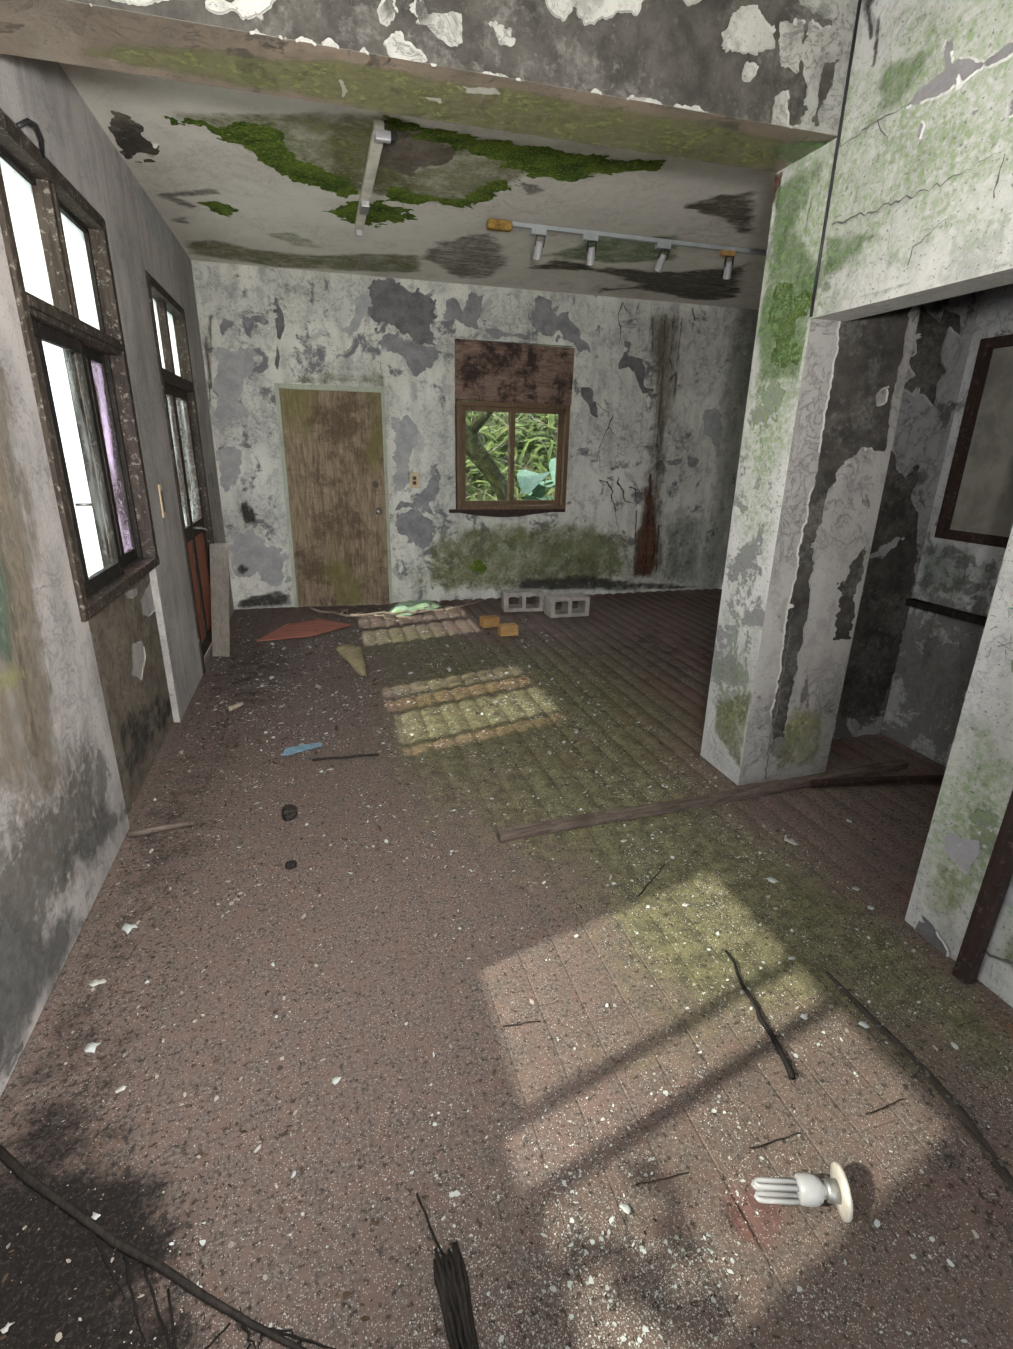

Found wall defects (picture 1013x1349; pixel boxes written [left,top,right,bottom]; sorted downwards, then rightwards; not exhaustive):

peeling [70,0,839,129]
peeling [906,39,1013,109]
damp [190,235,503,278]
damp [685,193,753,233]
peeling [343,277,590,377]
peeling [211,297,285,492]
damp [531,261,742,563]
peeling [391,415,440,549]
damp [0,370,55,789]
peeling [228,529,291,587]
damp [238,591,290,608]
damp [521,576,684,590]